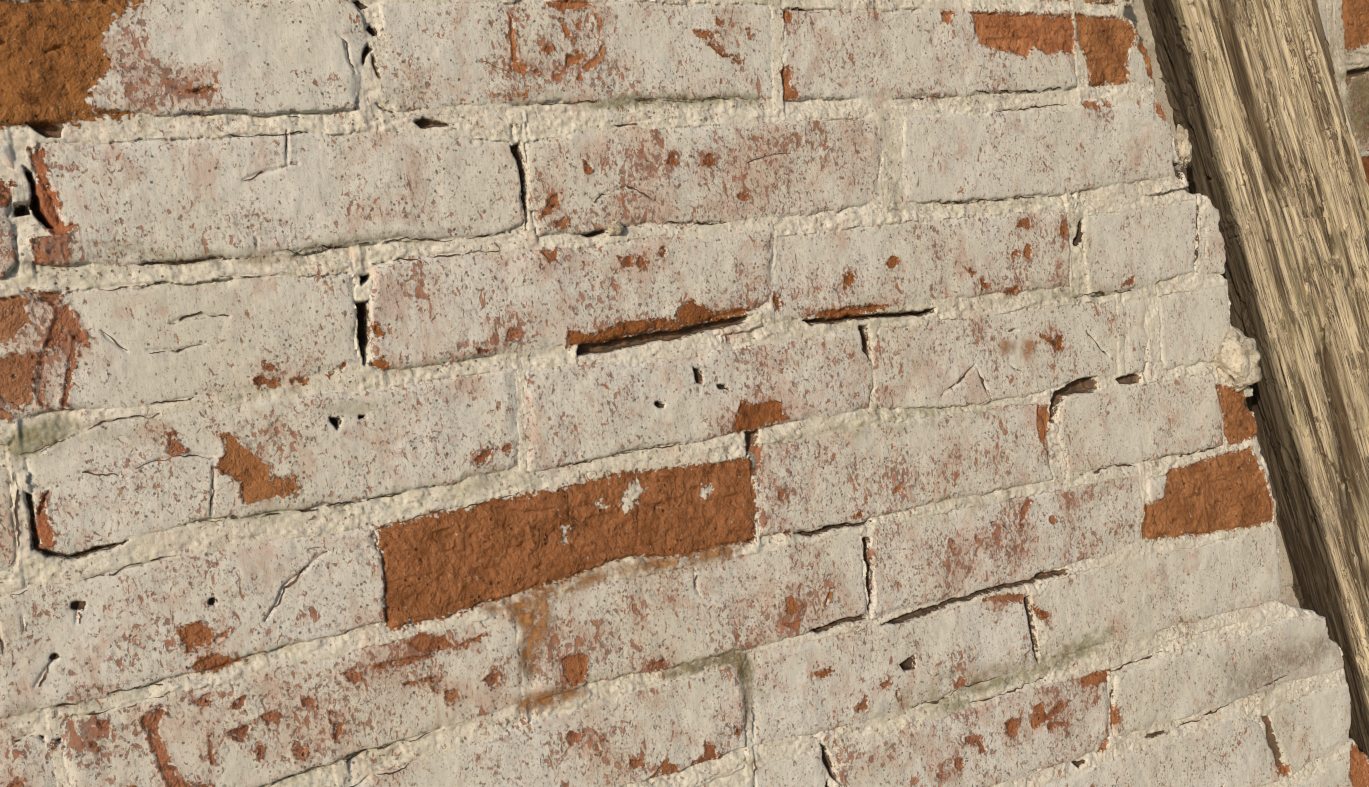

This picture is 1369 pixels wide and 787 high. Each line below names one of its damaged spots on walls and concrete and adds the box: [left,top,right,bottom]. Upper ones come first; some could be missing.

spalling [941,0,1155,112]
spalling [1341,0,1369,52]
spalling [0,0,144,265]
spalling [1361,156,1369,185]
peeling [0,287,90,423]
peeling [565,298,751,349]
peeling [800,302,889,322]
peeling [841,271,857,288]
peeling [211,430,301,505]
spalling [1141,384,1275,542]
spalling [339,398,790,707]
peeling [1349,743,1369,787]